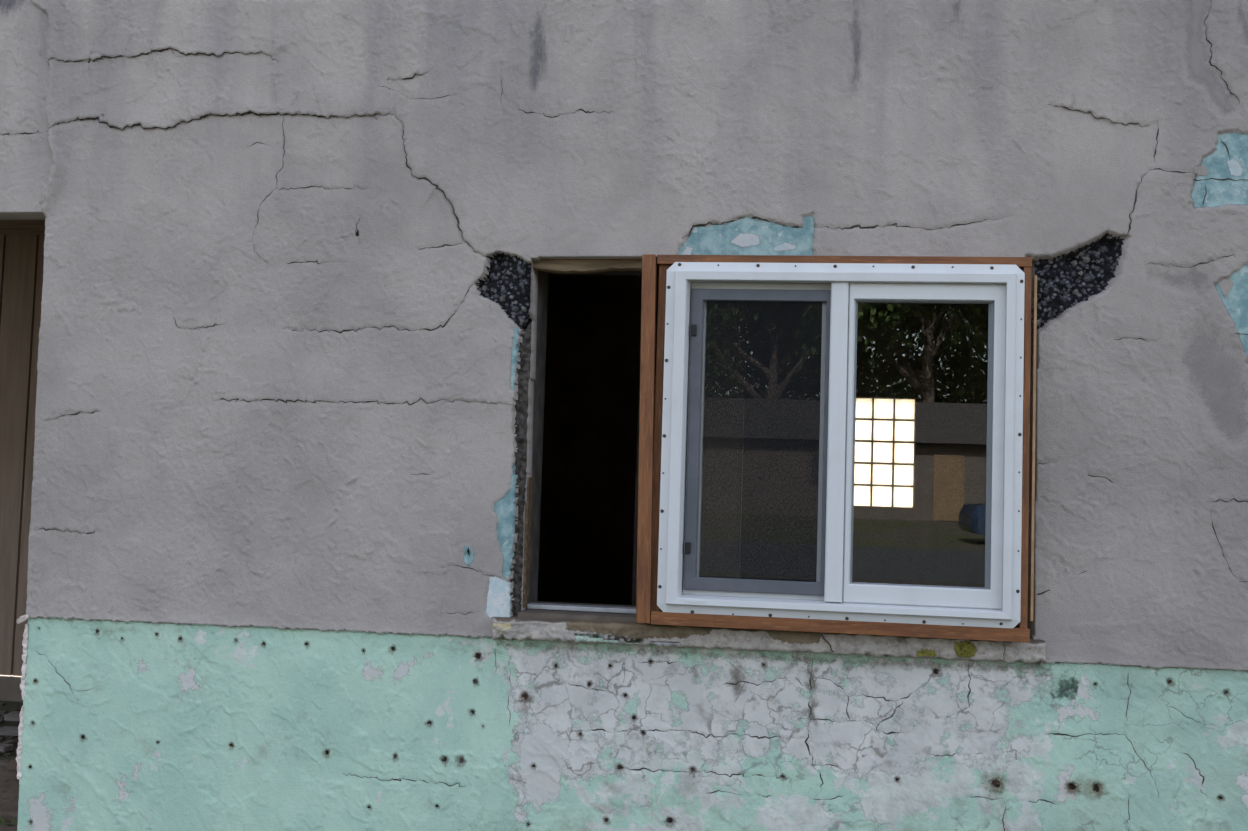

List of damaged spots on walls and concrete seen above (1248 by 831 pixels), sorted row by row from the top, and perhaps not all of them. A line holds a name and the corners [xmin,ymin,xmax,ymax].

crack [48,47,277,66]
crack [3,73,491,333]
peeling [677,216,815,256]
spalling [1031,233,1125,330]
crack [1050,104,1186,233]
peeling [1191,132,1248,208]
peeling [1215,264,1248,362]
crack [220,397,502,405]
peeling [476,252,1054,823]
crack [558,634,979,800]
peeling [1054,673,1100,723]
peeling [1050,765,1076,806]